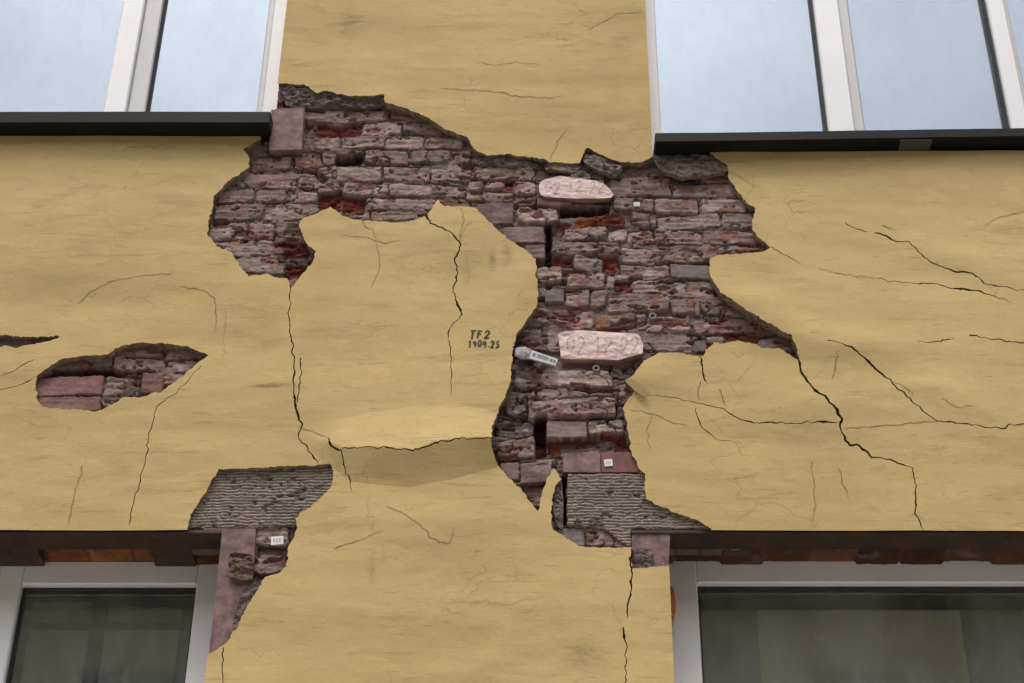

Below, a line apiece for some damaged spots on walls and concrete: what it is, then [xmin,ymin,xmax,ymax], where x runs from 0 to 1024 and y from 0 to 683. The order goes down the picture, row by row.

spalling [0,335,59,348]
spalling [35,342,208,412]
crack [129,366,201,527]
crack [288,288,493,488]
crack [426,209,465,395]
spalling [187,83,799,571]
crack [633,340,1024,532]
crack [770,223,1023,301]
crack [917,334,1024,343]
spalling [192,523,297,653]
crack [335,506,454,549]
crack [622,549,634,683]